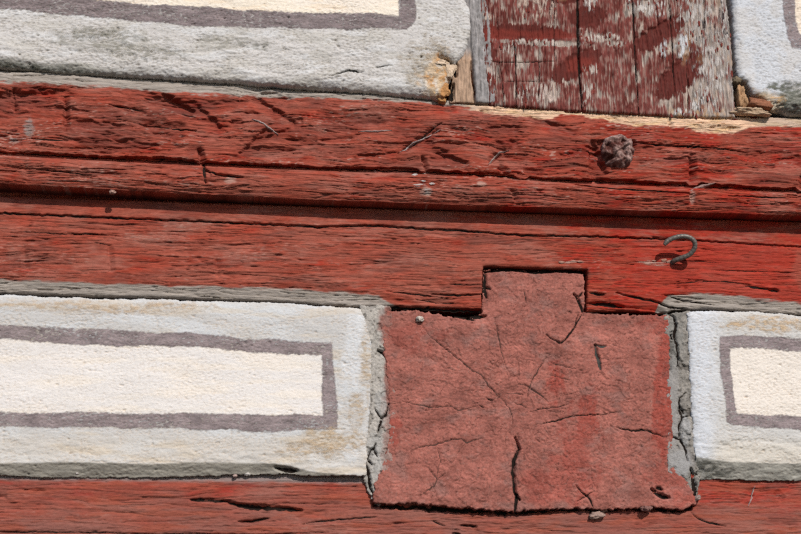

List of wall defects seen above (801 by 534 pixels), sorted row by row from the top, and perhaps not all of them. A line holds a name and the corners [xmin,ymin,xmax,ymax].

peeling [515,0,558,24]
spalling [423,52,458,105]
peeling [517,63,599,115]
peeling [500,29,622,56]
peeling [603,0,743,131]
crack [484,269,582,300]
crack [549,315,582,344]
crack [669,315,679,365]
crack [411,329,699,513]
crack [366,407,388,493]